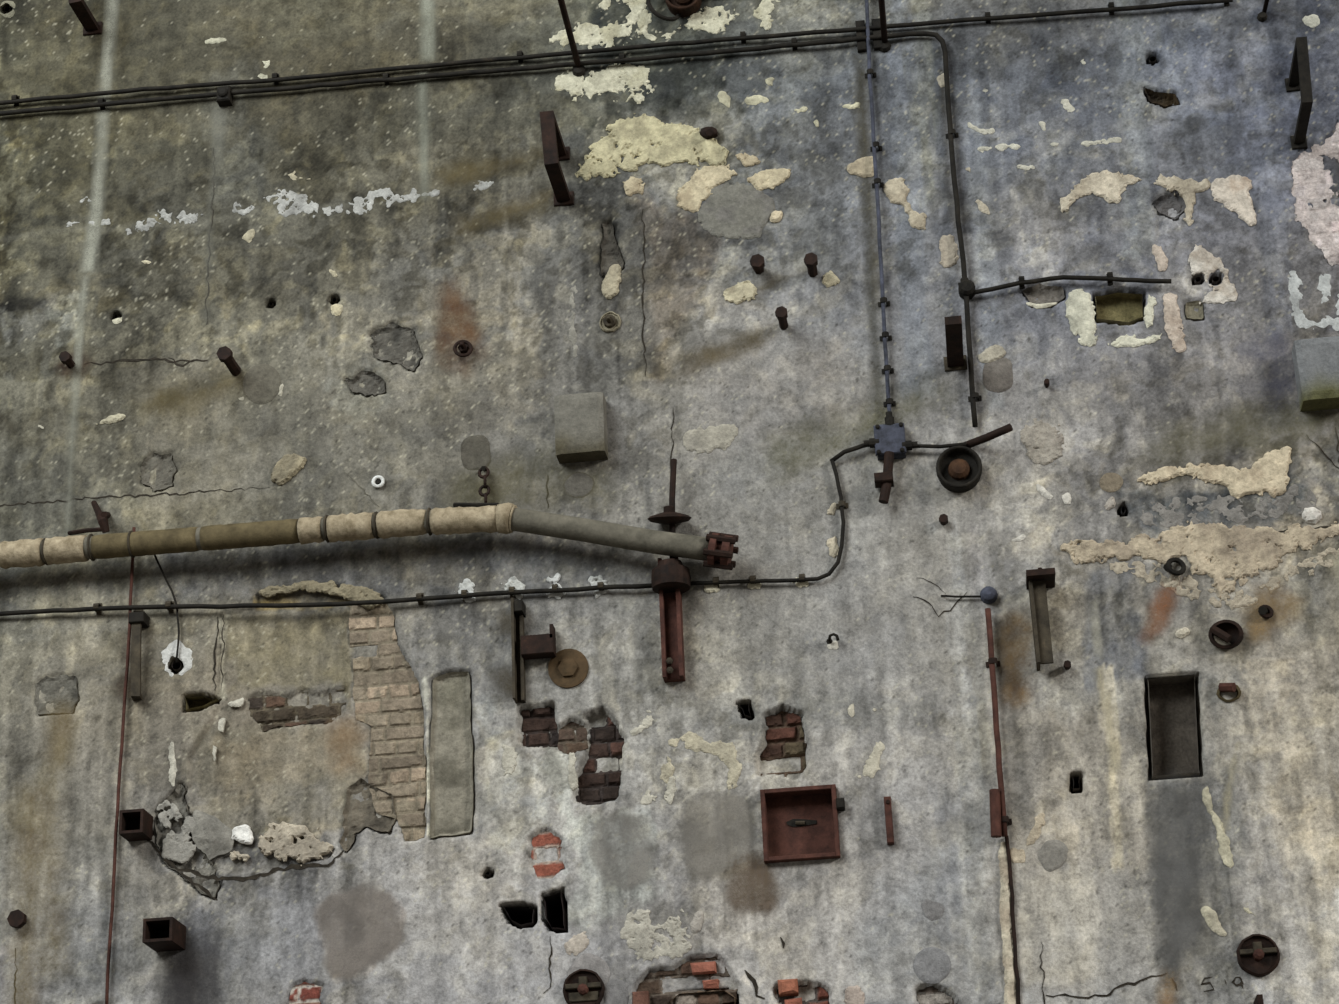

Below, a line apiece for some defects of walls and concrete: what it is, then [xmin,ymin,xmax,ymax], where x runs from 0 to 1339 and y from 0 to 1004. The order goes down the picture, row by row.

peeling [549,0,780,50]
peeling [551,63,655,114]
peeling [622,176,645,196]
peeling [735,153,791,191]
peeling [1153,173,1211,226]
spalling [1291,123,1339,315]
flaking render [212,604,427,857]
peeling [568,752,579,791]
spalling [155,784,221,898]
flaking render [289,982,323,1004]
flaking render [637,957,738,1004]
crack [1040,942,1168,1004]